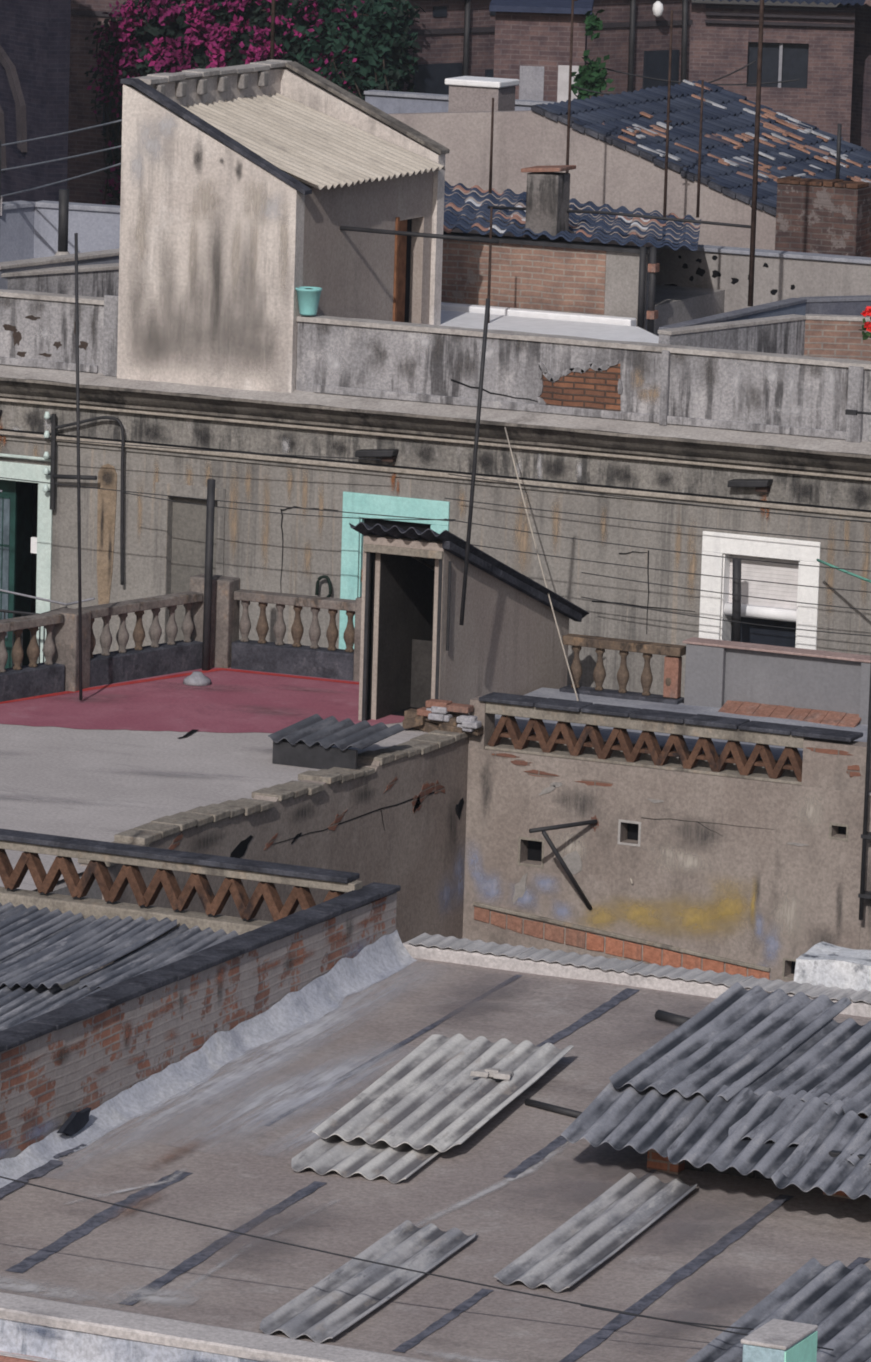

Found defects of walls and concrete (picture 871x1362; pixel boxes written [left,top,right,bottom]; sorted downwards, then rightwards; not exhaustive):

spalling [537,360,623,412]